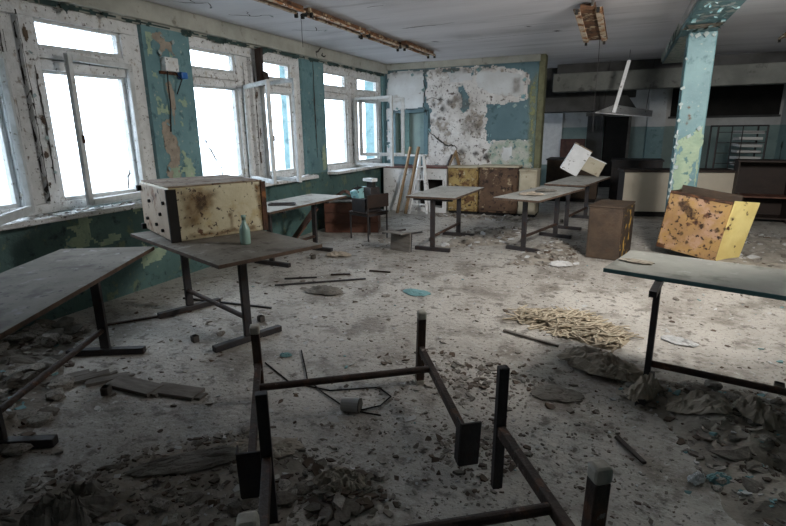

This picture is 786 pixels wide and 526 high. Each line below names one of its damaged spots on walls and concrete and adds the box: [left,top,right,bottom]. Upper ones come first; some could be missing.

peeling [25,0,175,58]
peeling [13,9,57,201]
spalling [152,71,196,178]
peeling [181,29,533,168]
peeling [667,119,704,199]
peeling [64,217,121,249]
peeling [141,242,167,269]